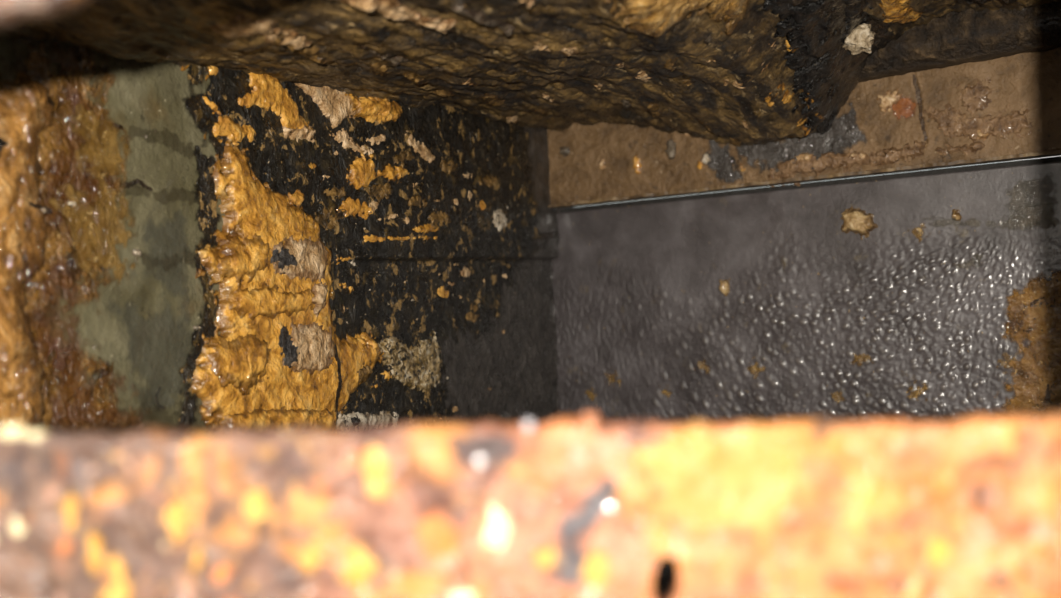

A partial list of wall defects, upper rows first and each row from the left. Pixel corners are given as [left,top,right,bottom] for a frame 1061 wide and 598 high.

peeling [208,13,334,64]
peeling [341,0,515,37]
peeling [202,96,256,146]
peeling [238,73,497,242]
rust [0,39,148,432]
peeling [437,263,479,323]
peeling [343,306,392,388]
rust [997,270,1061,415]
rust [52,493,132,598]
rust [242,488,267,526]
rust [363,445,392,499]
rust [631,425,816,544]